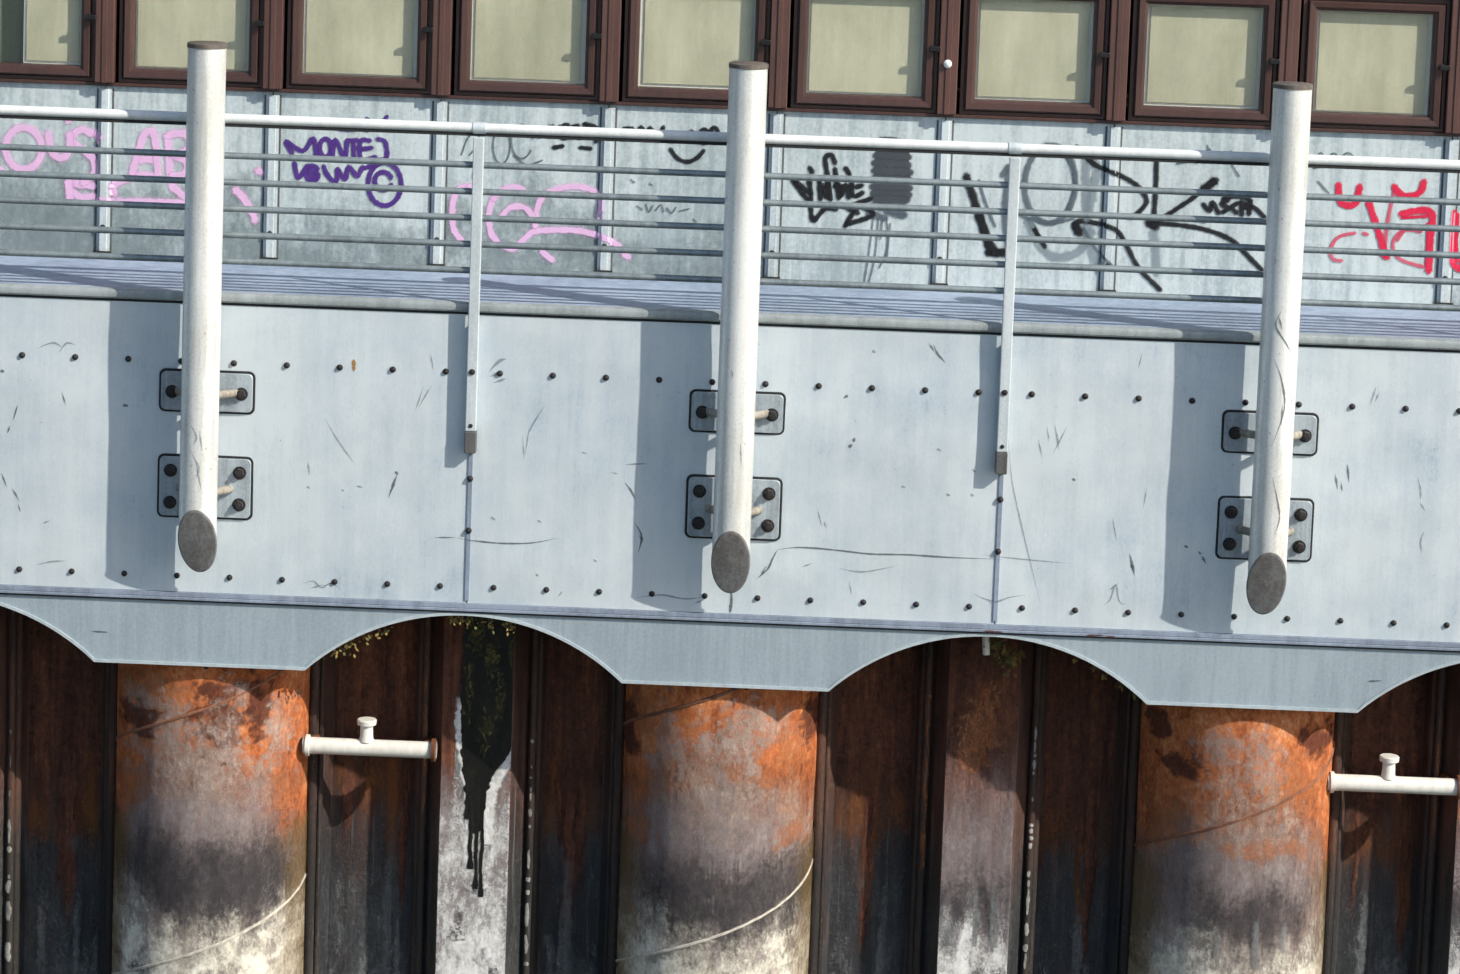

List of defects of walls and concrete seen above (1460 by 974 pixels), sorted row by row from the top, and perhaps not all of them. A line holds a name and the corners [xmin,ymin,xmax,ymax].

corrosion [28,618,310,914]
water stain [73,815,307,974]
corrosion [334,615,465,902]
water stain [436,750,510,974]
water stain [523,850,572,974]
corrosion [544,635,606,929]
water stain [616,830,814,974]
corrosion [622,683,819,884]
corrosion [837,645,931,941]
water stain [1128,849,1328,974]
corrosion [1136,674,1441,953]
water stain [1448,887,1460,974]